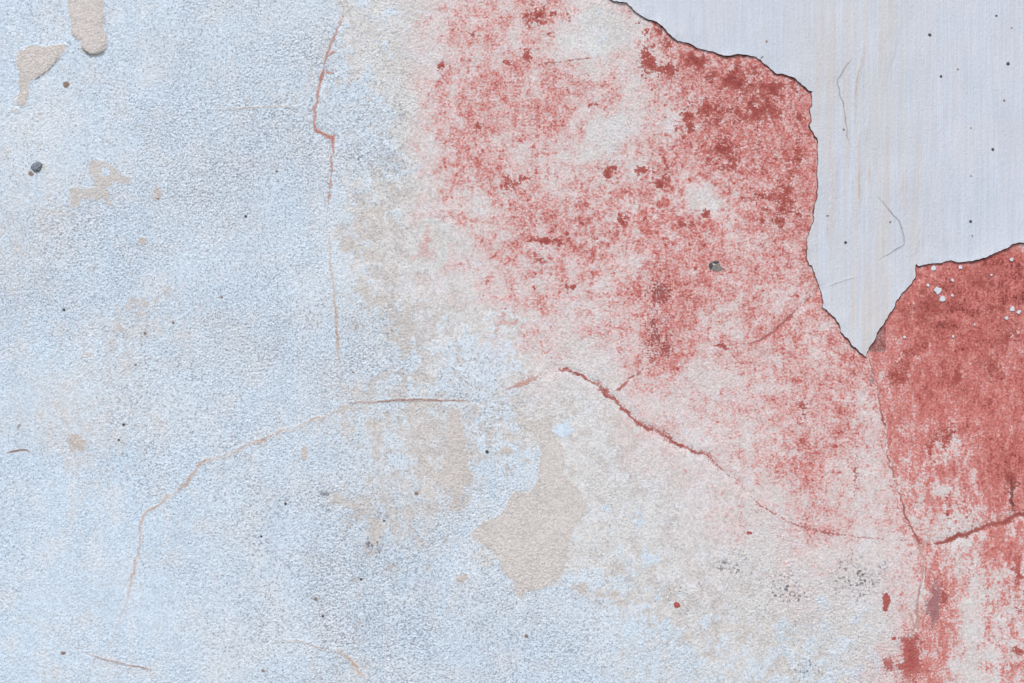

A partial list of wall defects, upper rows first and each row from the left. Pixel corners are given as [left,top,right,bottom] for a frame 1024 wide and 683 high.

peeling [12,0,109,109]
crack [74,15,478,683]
peeling [384,0,1024,683]
crack [506,357,1024,638]